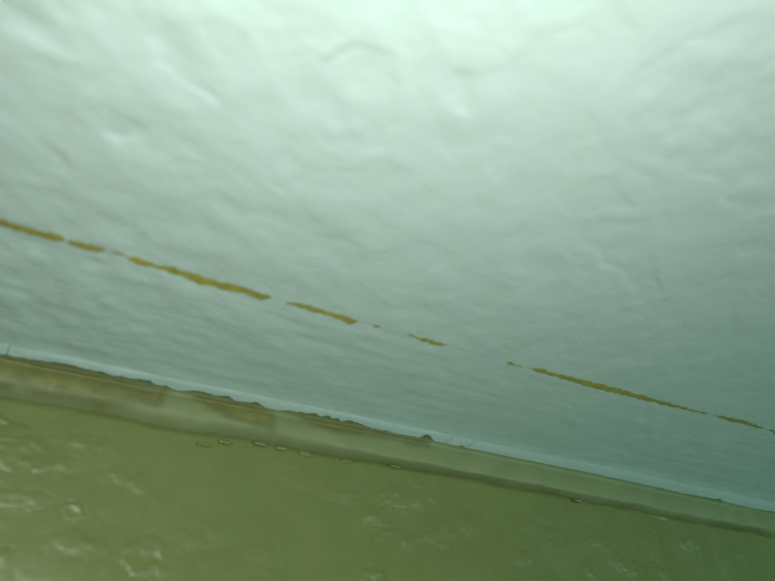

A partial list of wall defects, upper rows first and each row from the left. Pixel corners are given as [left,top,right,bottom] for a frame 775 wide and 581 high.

crack [0,219,775,434]